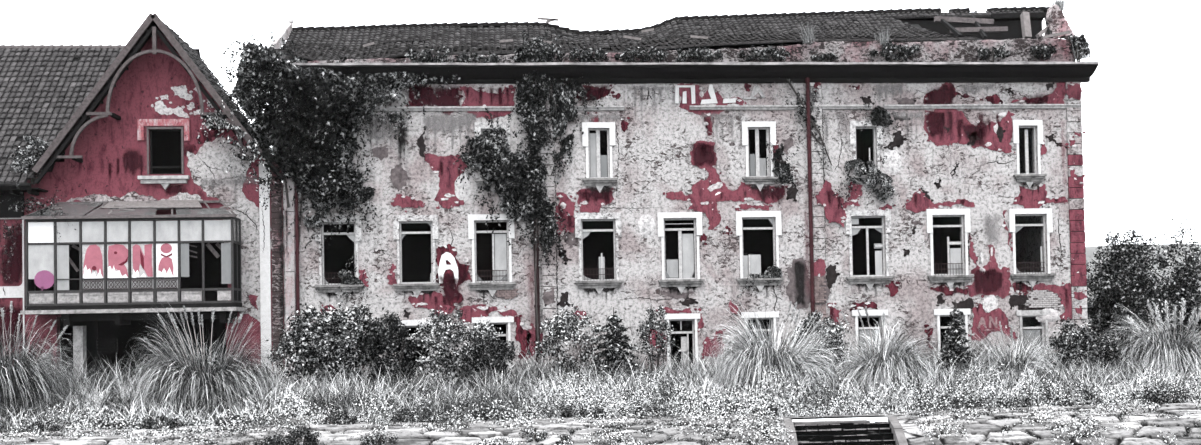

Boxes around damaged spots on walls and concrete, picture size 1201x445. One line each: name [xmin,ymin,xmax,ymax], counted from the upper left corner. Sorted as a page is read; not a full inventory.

spalling [66,85,272,326]
peeling [372,84,517,213]
peeling [663,83,798,245]
peeling [812,180,863,227]
peeling [879,179,975,235]
peeling [884,82,1086,155]
peeling [1068,167,1085,185]
peeling [359,269,369,287]
peeling [387,263,397,285]
peeling [404,244,543,361]
peeling [930,182,1087,341]